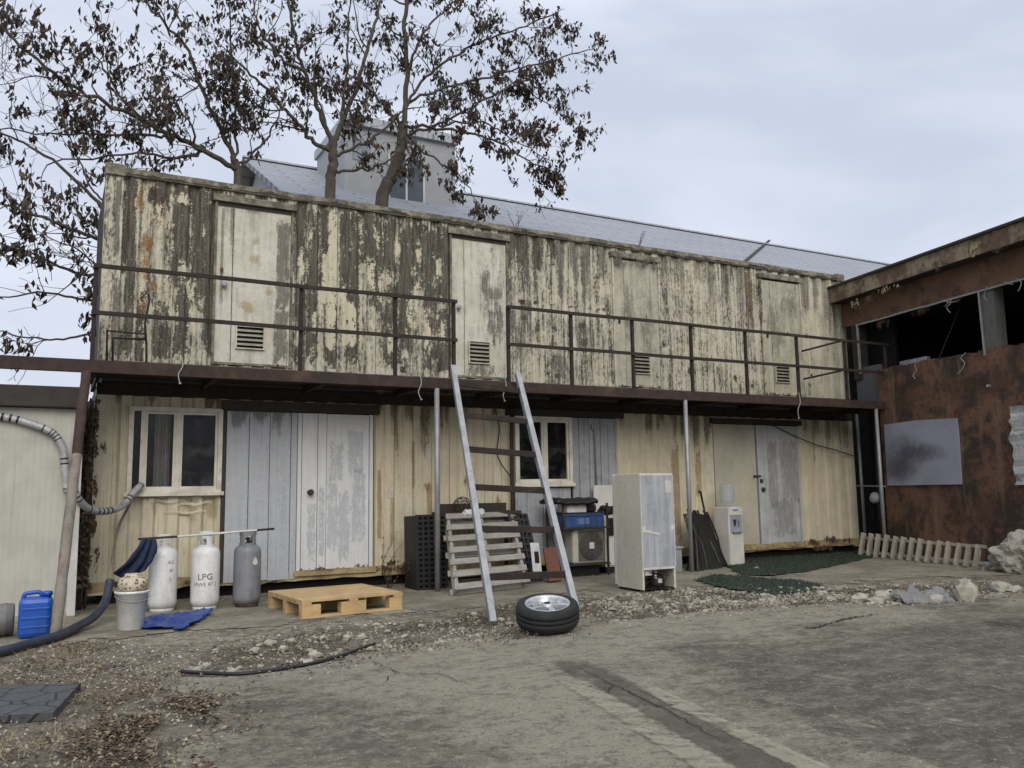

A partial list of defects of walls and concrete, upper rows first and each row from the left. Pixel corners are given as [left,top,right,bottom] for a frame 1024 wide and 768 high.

rust [136,186,165,290]
peeling [135,183,190,240]
peeling [135,245,197,350]
peeling [297,222,314,285]
peeling [311,210,447,361]
water stain [480,232,660,363]
water stain [745,272,757,325]